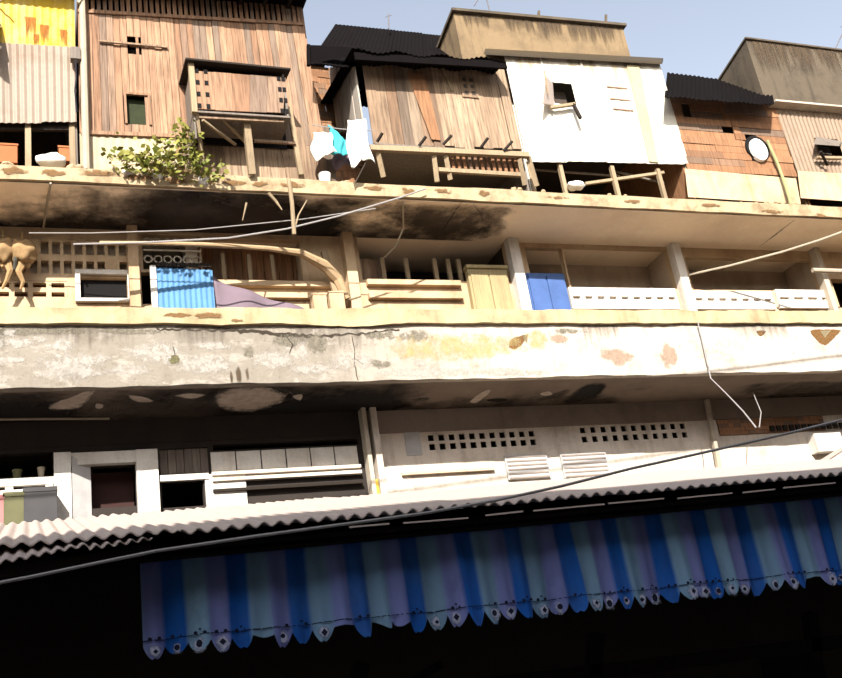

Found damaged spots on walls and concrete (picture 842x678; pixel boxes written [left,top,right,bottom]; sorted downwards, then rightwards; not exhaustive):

leakage [752,41,842,68]
leakage [353,206,505,241]
crack [156,327,400,380]
spalling [509,334,528,349]
spalling [811,329,841,345]